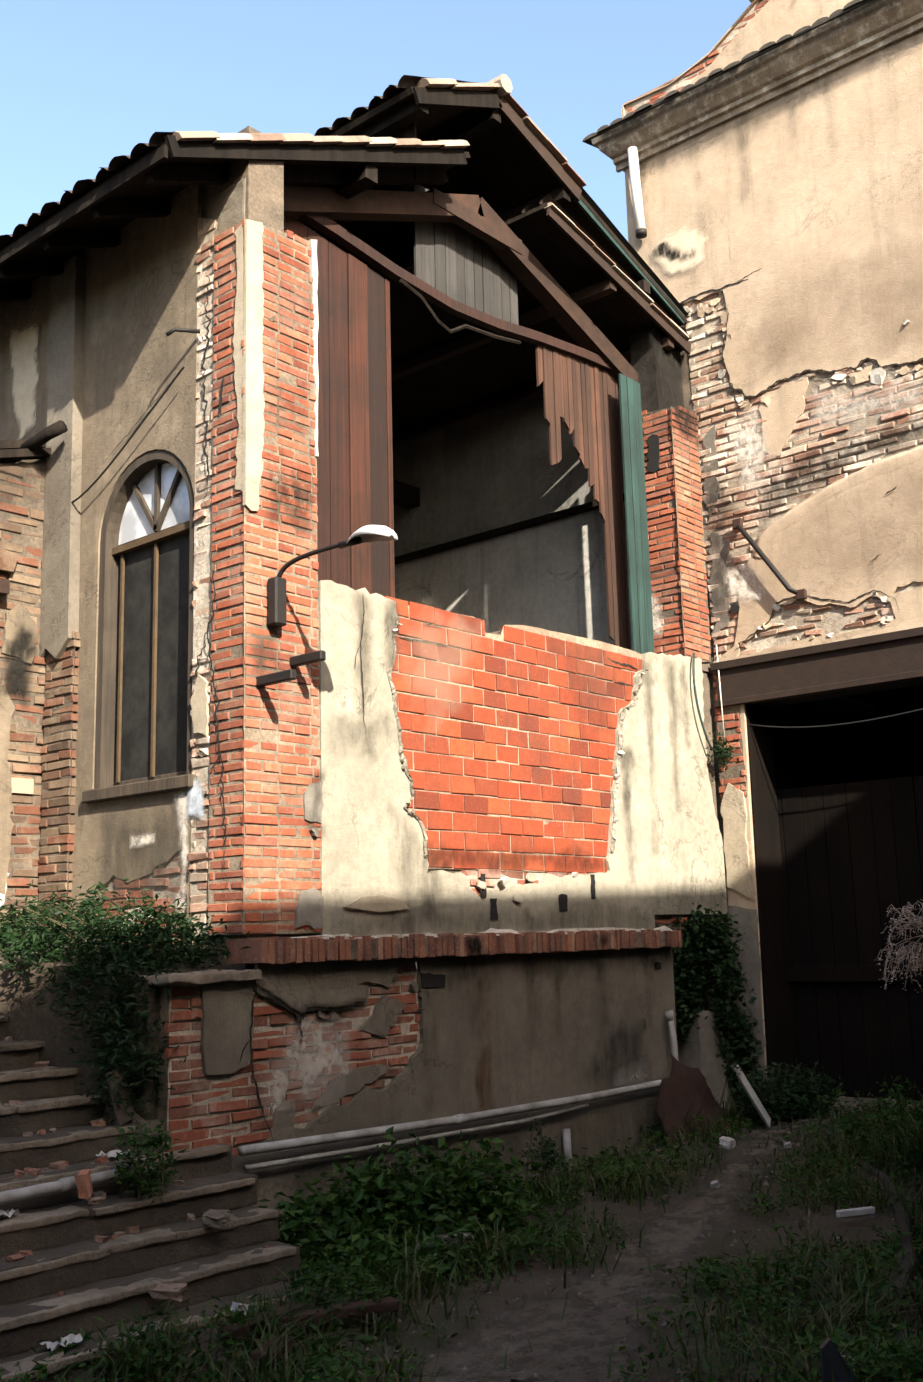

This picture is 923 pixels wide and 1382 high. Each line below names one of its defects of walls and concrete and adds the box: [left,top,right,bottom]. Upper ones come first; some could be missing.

crack [682,268,923,398]
flaking render [683,291,923,800]
damp [6,628,33,696]
flaking render [387,618,429,857]
flaking render [610,669,649,852]
flaking render [164,962,429,1156]
crack [239,967,369,1139]